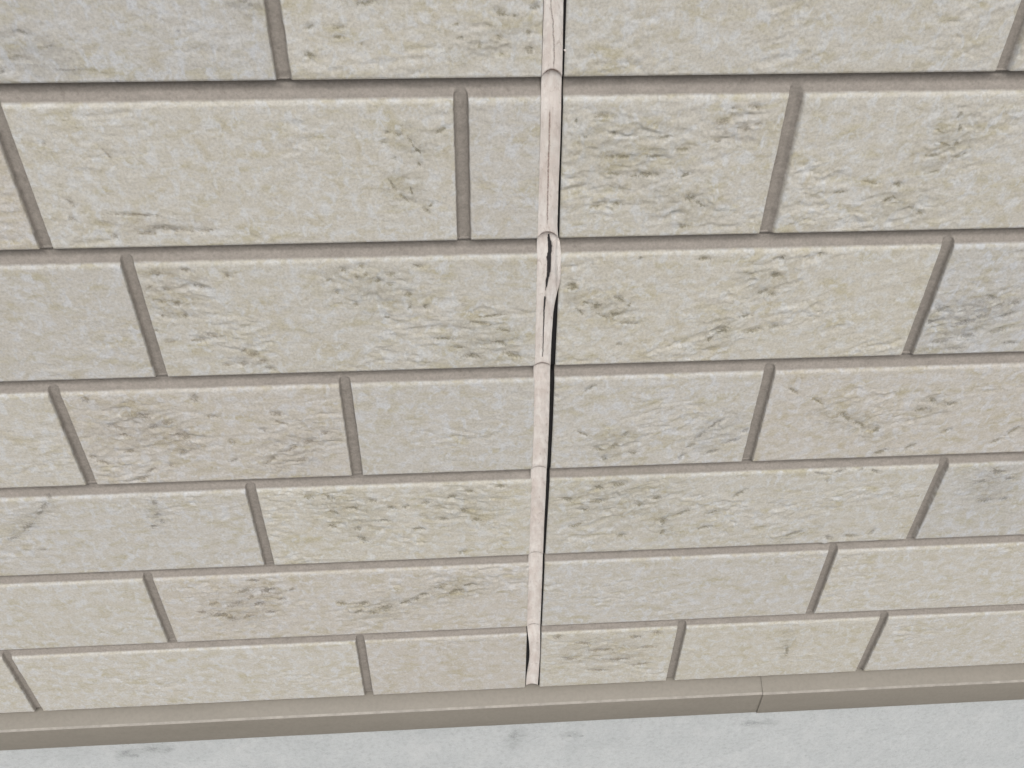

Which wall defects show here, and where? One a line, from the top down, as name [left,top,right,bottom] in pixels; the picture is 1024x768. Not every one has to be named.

crack [525,0,566,685]